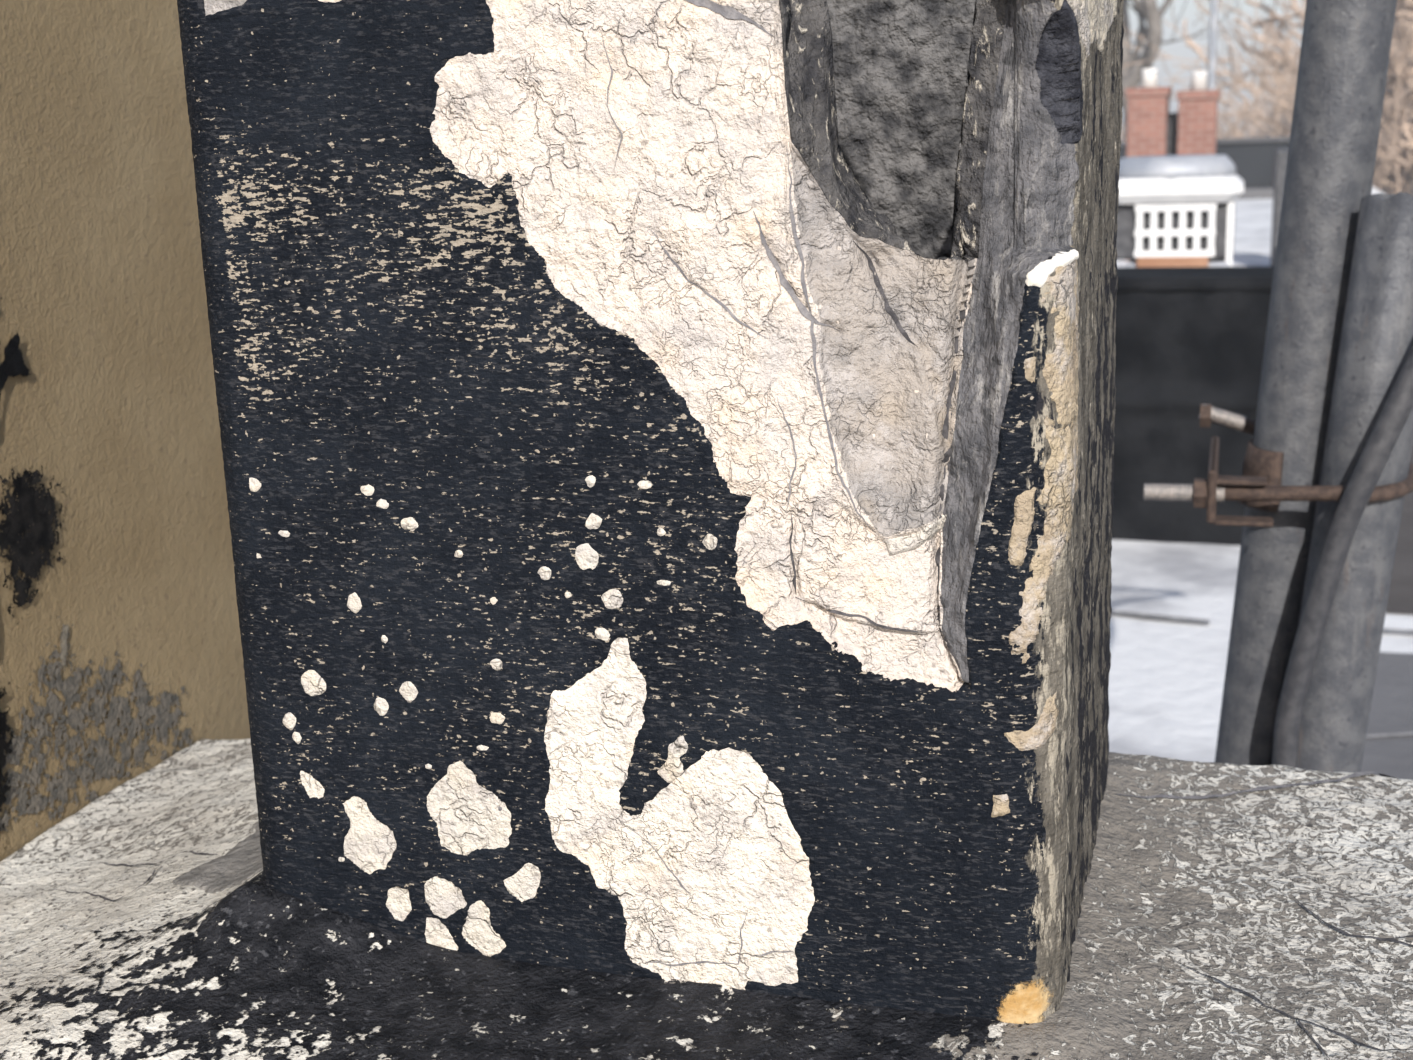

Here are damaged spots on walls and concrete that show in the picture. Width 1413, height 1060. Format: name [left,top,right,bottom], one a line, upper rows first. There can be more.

spalling [430,0,978,692]
peeling [1008,246,1080,664]
peeling [301,670,326,696]
peeling [374,681,418,716]
peeling [1004,692,1059,751]
peeling [300,771,324,799]
peeling [338,796,397,874]
peeling [425,761,512,855]
peeling [544,628,815,990]
crack [1117,771,1400,799]
peeling [386,876,506,957]
peeling [503,863,541,902]